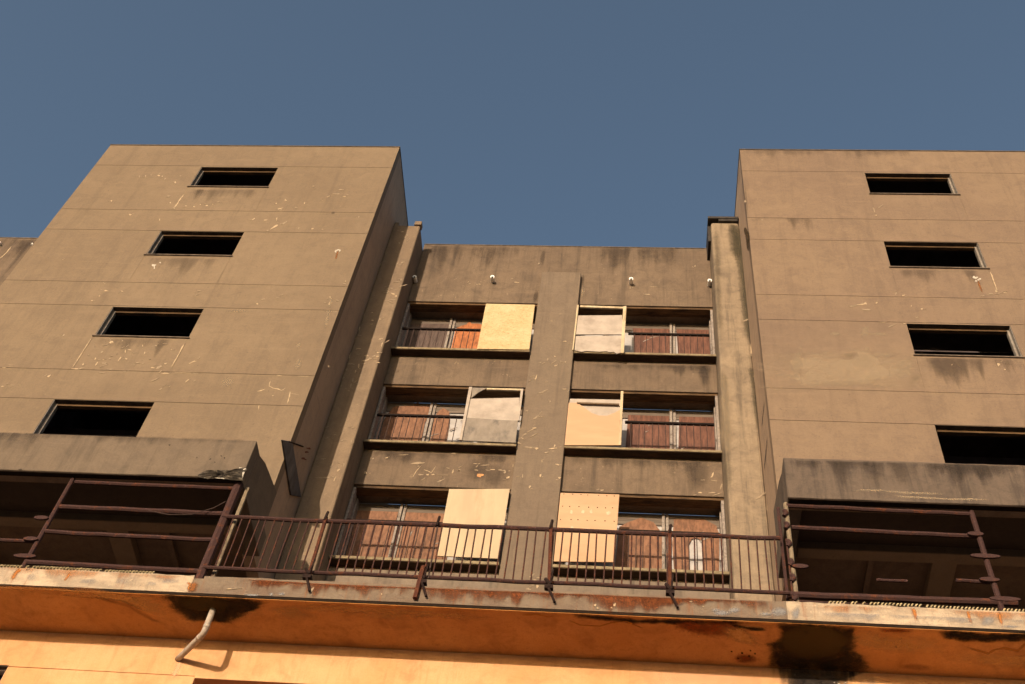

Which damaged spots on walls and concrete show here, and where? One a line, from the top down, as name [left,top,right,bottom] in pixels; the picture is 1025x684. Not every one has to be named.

peeling [413,463,533,489]
leakage [165,594,260,622]
corrosion [253,580,754,610]
leakage [578,601,763,631]
leakage [763,609,867,684]
leakage [943,630,1025,654]